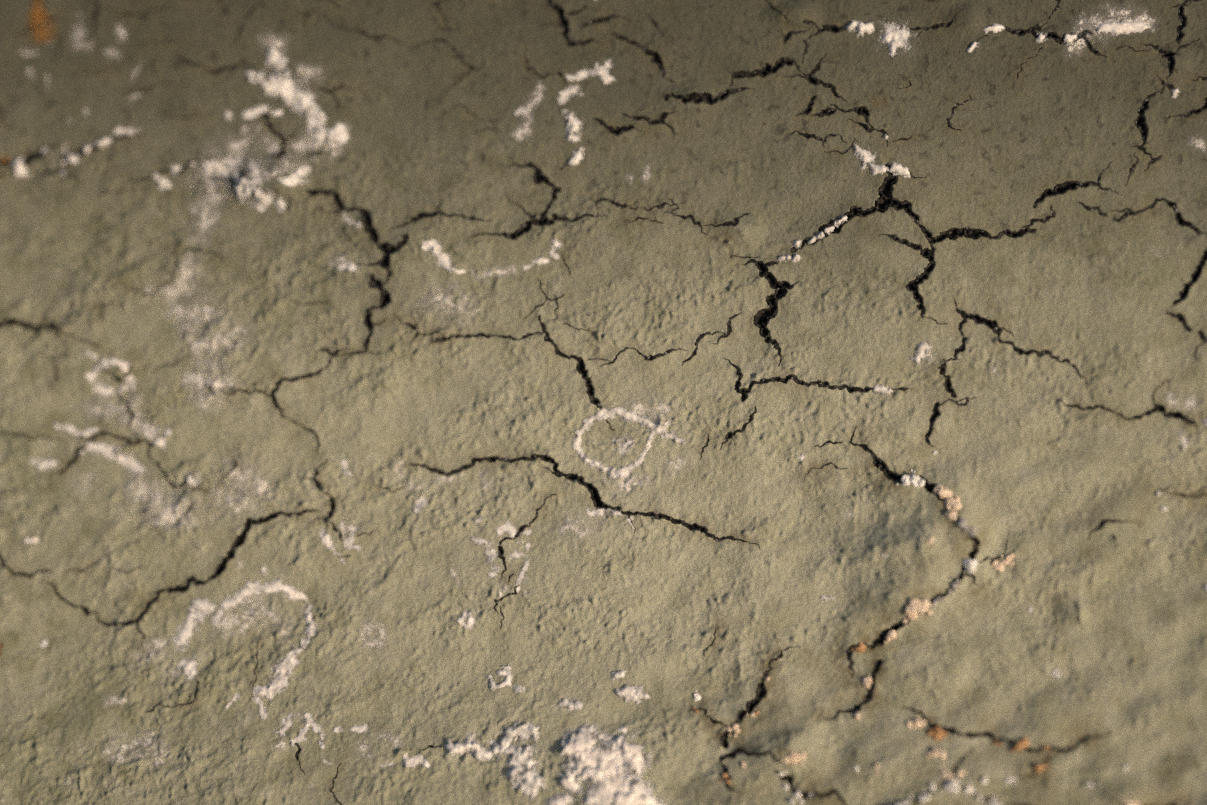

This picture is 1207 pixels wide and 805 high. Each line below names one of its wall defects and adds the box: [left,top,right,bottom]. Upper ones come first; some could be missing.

water stain [512,60,616,166]
crack [548,0,913,154]
water stain [845,20,917,57]
crack [969,0,1200,181]
water stain [1064,5,1155,55]
water stain [146,35,350,411]
crack [0,162,1207,653]
water stain [130,566,318,720]
crack [808,426,1008,721]
water stain [443,698,668,805]
crack [688,646,846,805]
crack [902,707,1111,805]